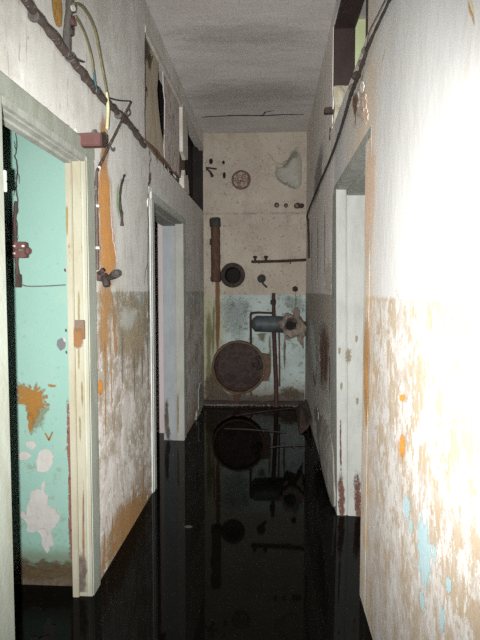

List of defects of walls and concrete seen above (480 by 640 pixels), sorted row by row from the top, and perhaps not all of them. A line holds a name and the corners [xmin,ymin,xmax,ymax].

crack [203,110,304,118]
water stain [115,294,147,395]
water stain [205,317,304,401]
corrosion [319,328,330,395]
peeling [18,403,72,559]
corrosion [337,478,345,516]
peeling [403,495,436,613]